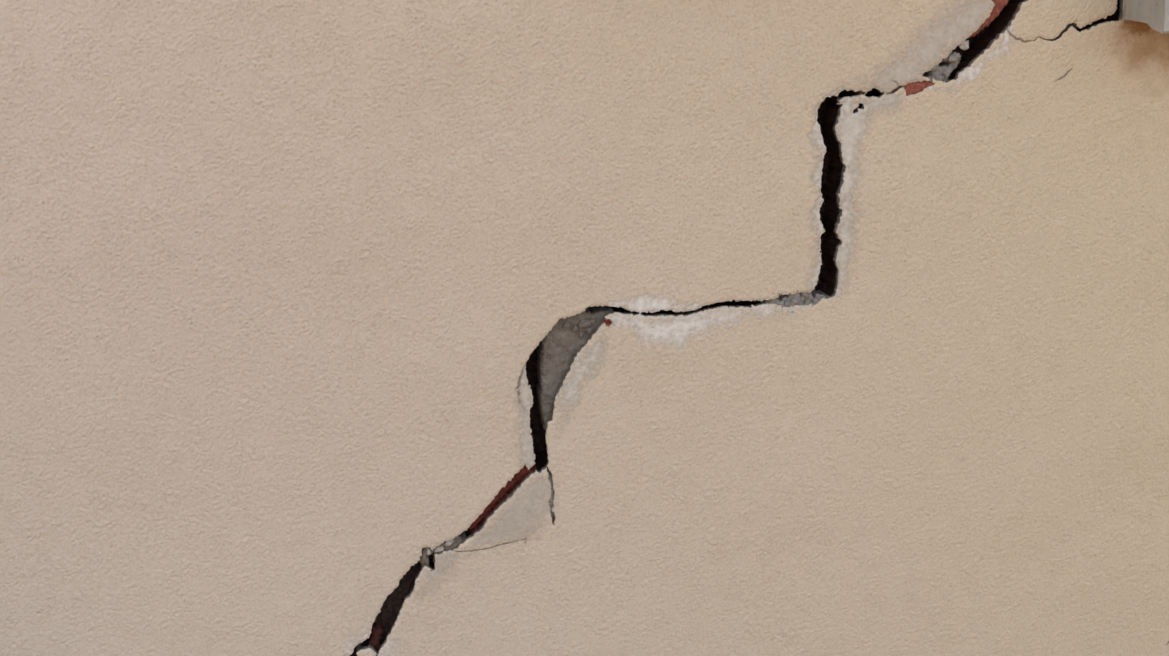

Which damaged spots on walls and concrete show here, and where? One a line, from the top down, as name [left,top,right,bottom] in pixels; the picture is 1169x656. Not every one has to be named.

peeling [807,0,1014,296]
flaking render [517,294,804,470]
crack [350,0,1123,656]